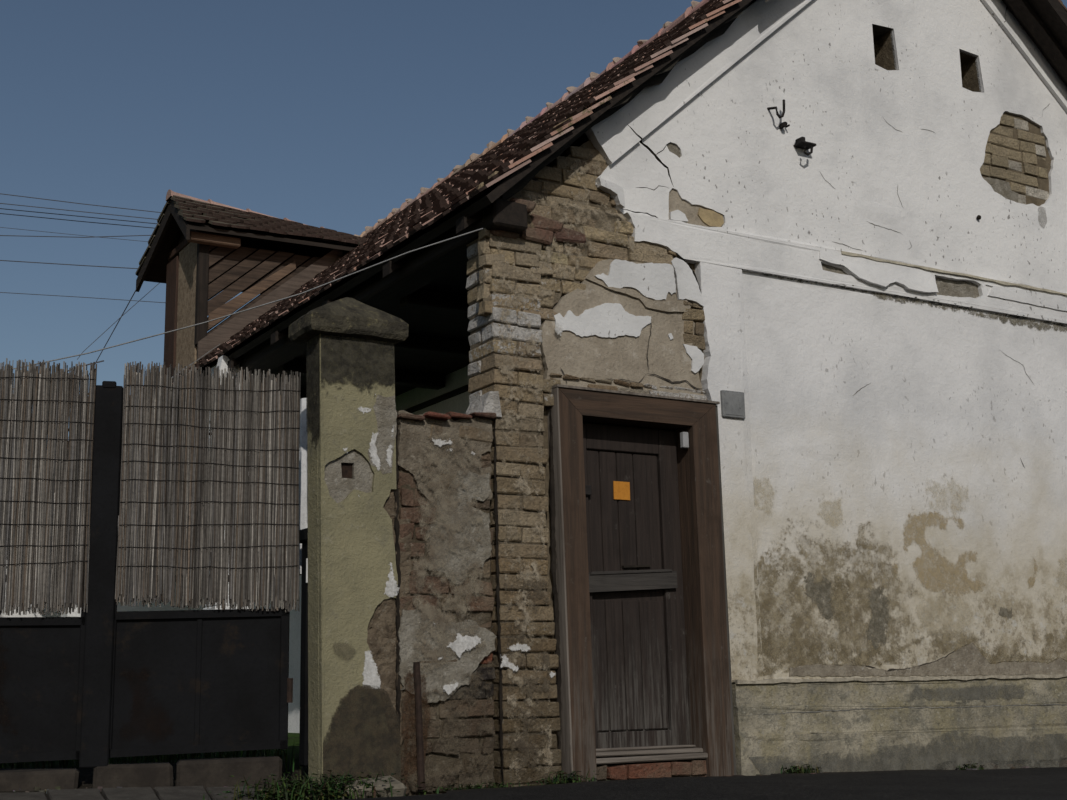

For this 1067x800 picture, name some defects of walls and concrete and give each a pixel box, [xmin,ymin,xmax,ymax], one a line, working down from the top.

crack [624,124,674,218]
flaking render [669,189,724,227]
flaking render [980,115,1049,204]
flaking render [819,248,1067,312]
flaking render [324,143,707,792]
water stain [754,512,1067,677]
water stain [911,685,1024,704]
water stain [749,730,1067,775]